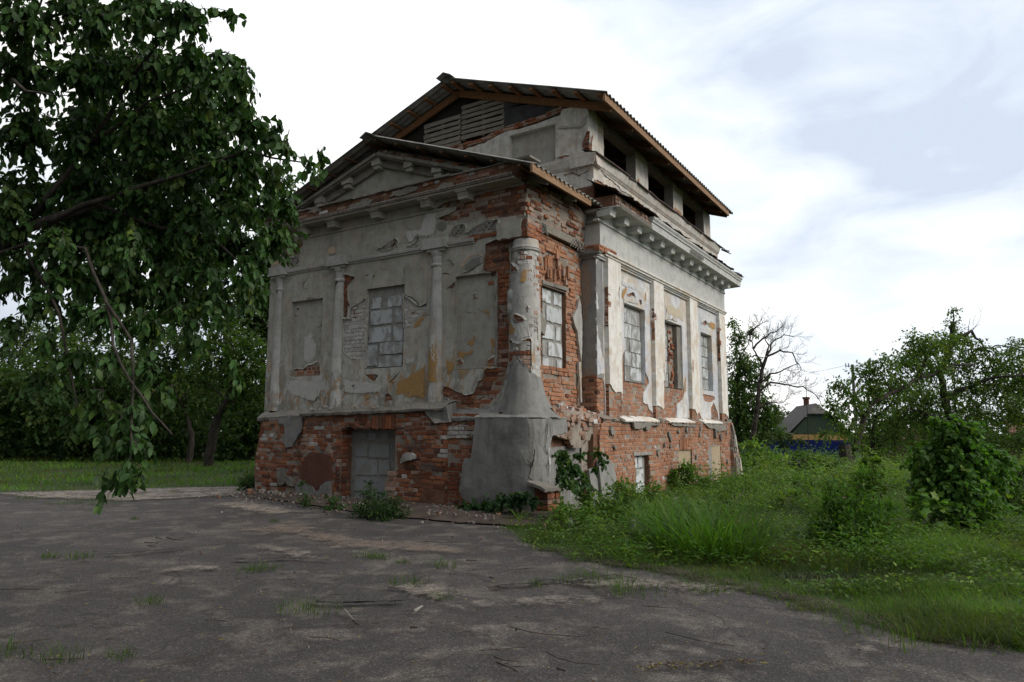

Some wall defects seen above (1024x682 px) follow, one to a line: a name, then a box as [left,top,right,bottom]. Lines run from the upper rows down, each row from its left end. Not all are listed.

flaking render [342,272,375,361]
flaking render [436,184,534,414]
spalling [542,245,570,287]
spalling [551,287,741,476]
flaking render [447,425,475,438]